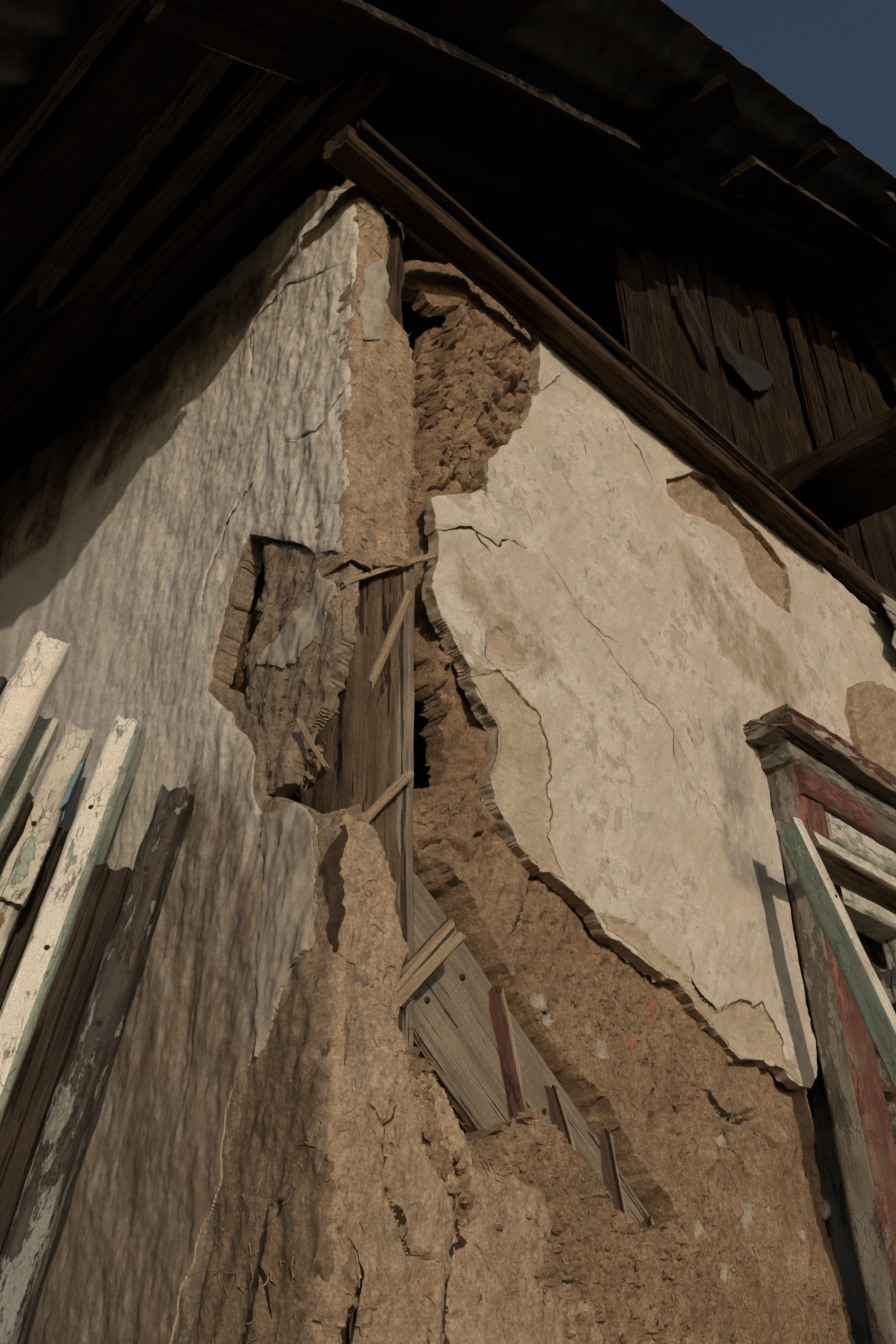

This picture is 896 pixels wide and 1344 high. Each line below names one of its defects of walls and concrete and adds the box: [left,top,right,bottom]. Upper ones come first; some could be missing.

water stain [0,258,289,577]
spalling [189,542,363,1344]
crack [435,526,728,827]
spalling [358,258,855,1344]
crack [247,1265,272,1332]
crack [312,1243,364,1344]
crack [370,1104,467,1344]